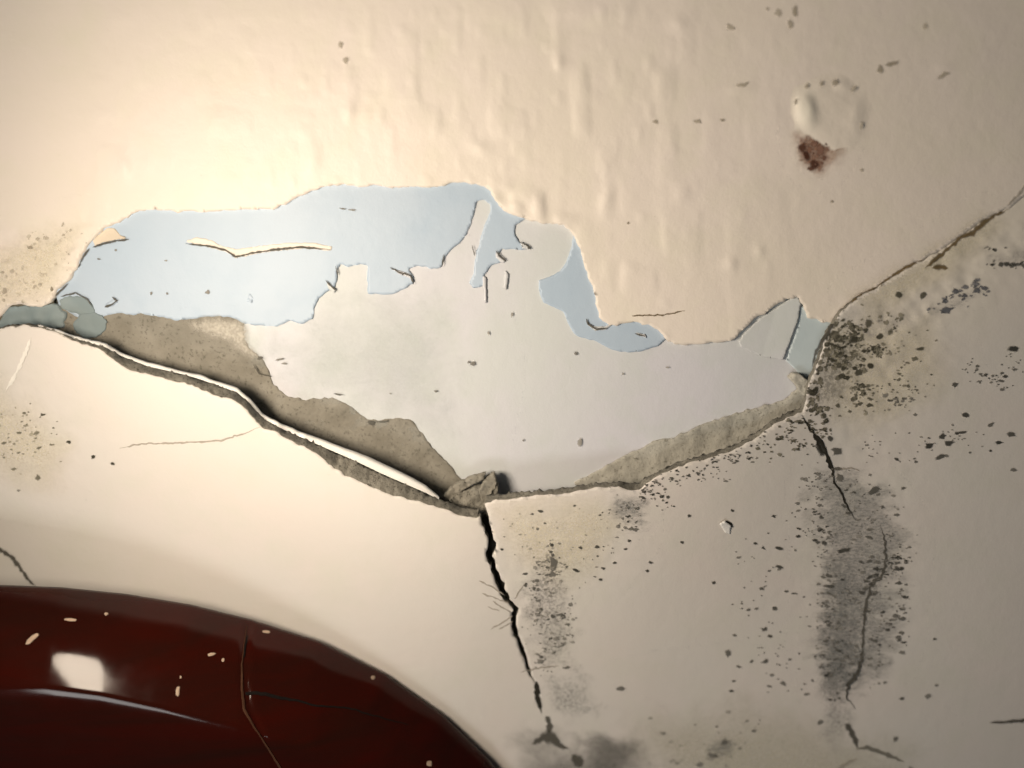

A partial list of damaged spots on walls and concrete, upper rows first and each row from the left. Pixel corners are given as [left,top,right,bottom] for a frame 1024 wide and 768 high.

corrosion [799,138,833,171]
crack [0,301,67,329]
peeling [0,182,830,502]
crack [812,324,833,366]
crack [850,186,1024,303]
mould [920,278,990,314]
mould [984,246,1024,269]
leakage [2,403,71,458]
mould [500,304,1023,701]
crack [803,417,859,520]
crack [480,516,583,767]
crack [840,526,911,768]